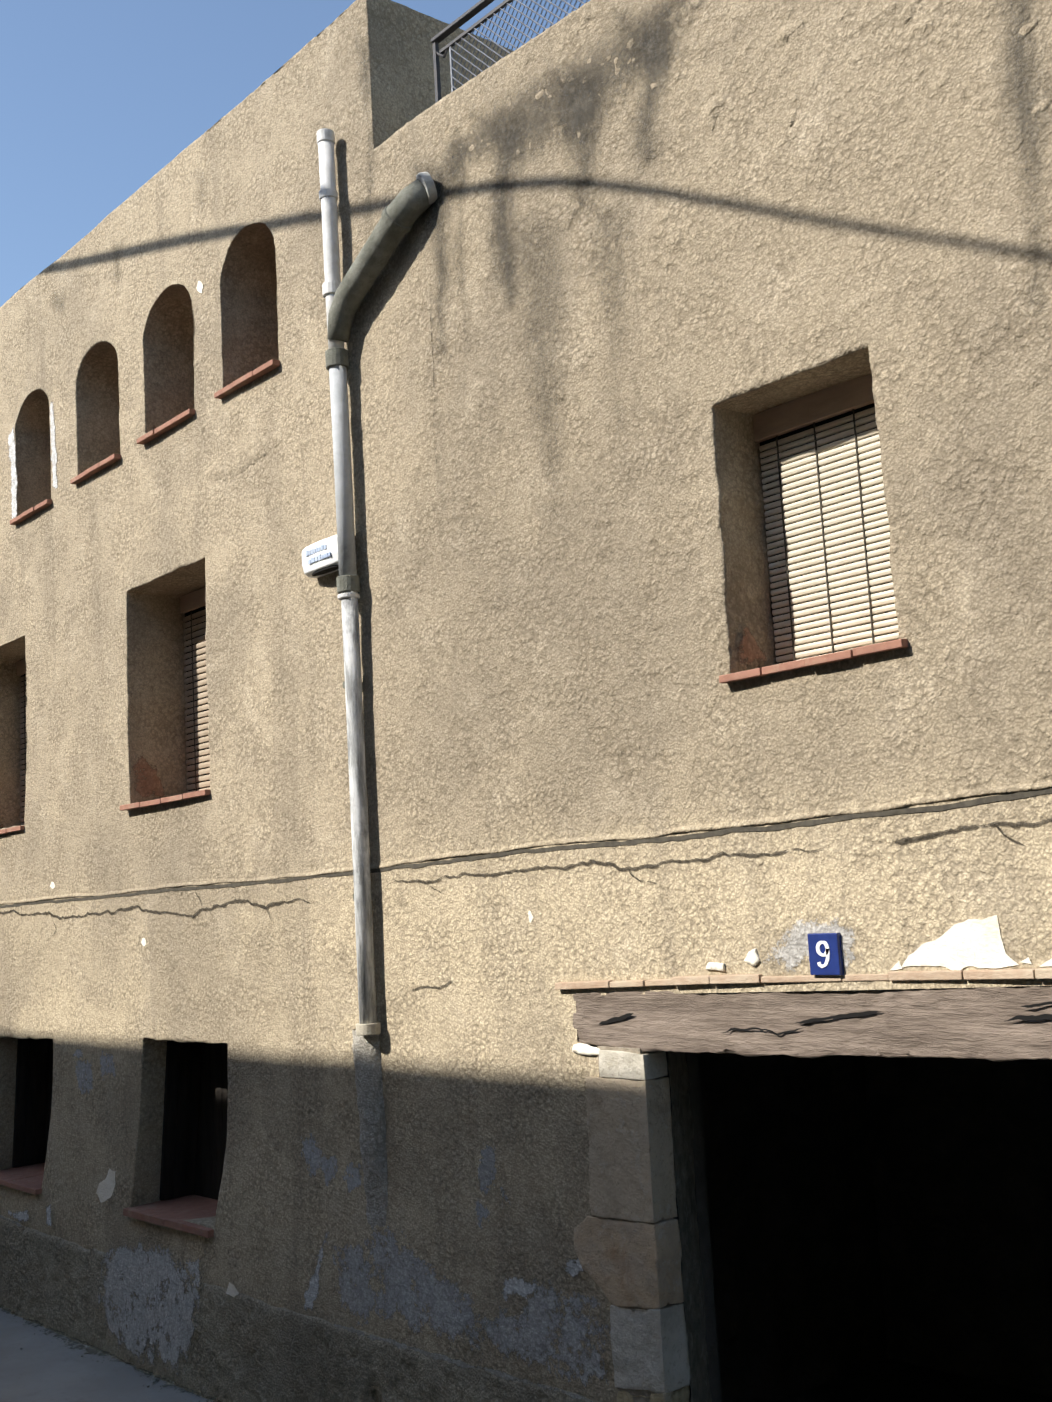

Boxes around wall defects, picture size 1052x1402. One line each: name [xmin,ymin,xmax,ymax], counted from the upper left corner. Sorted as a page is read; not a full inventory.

crack [879,818,1052,846]
crack [390,848,823,893]
crack [0,886,332,936]
spalling [890,915,1052,970]
peeling [502,1277,535,1300]